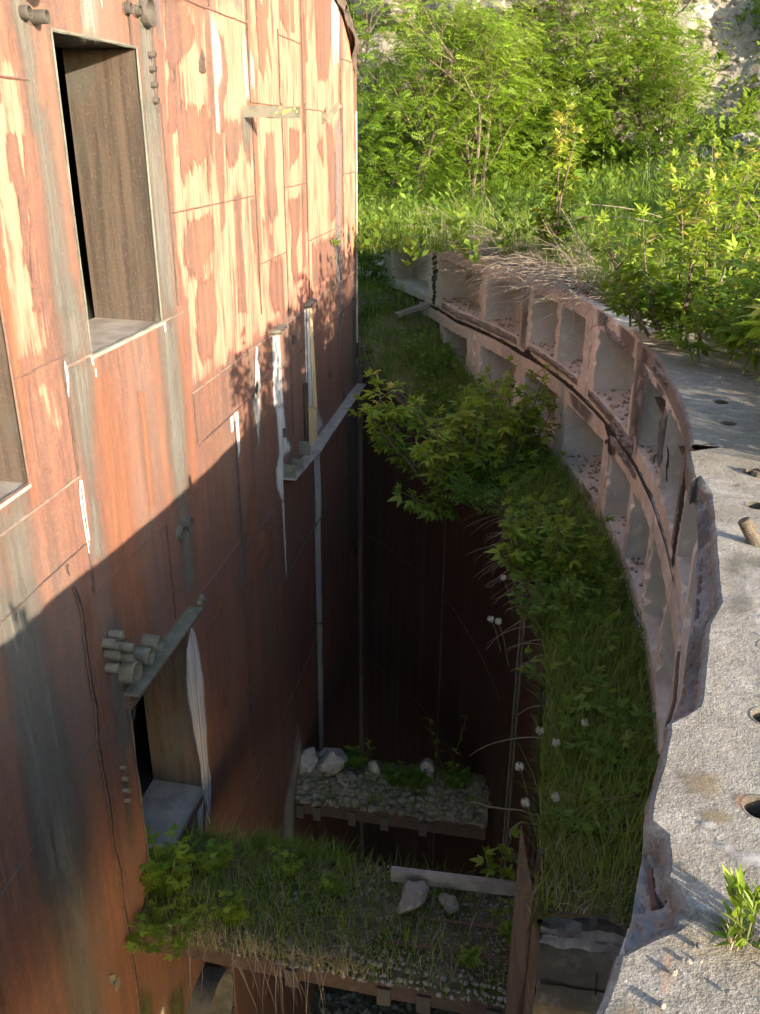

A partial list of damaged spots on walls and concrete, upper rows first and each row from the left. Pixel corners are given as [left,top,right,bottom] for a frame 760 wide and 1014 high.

water stain [211,21,221,131]
peeling [255,0,332,84]
rust [0,253,26,433]
water stain [140,0,187,498]
peeling [181,210,219,366]
peeling [234,122,338,318]
water stain [230,412,240,458]
water stain [272,334,290,575]
crack [605,428,613,456]
crack [666,447,686,567]
spalling [665,482,723,727]
spalling [621,835,693,955]